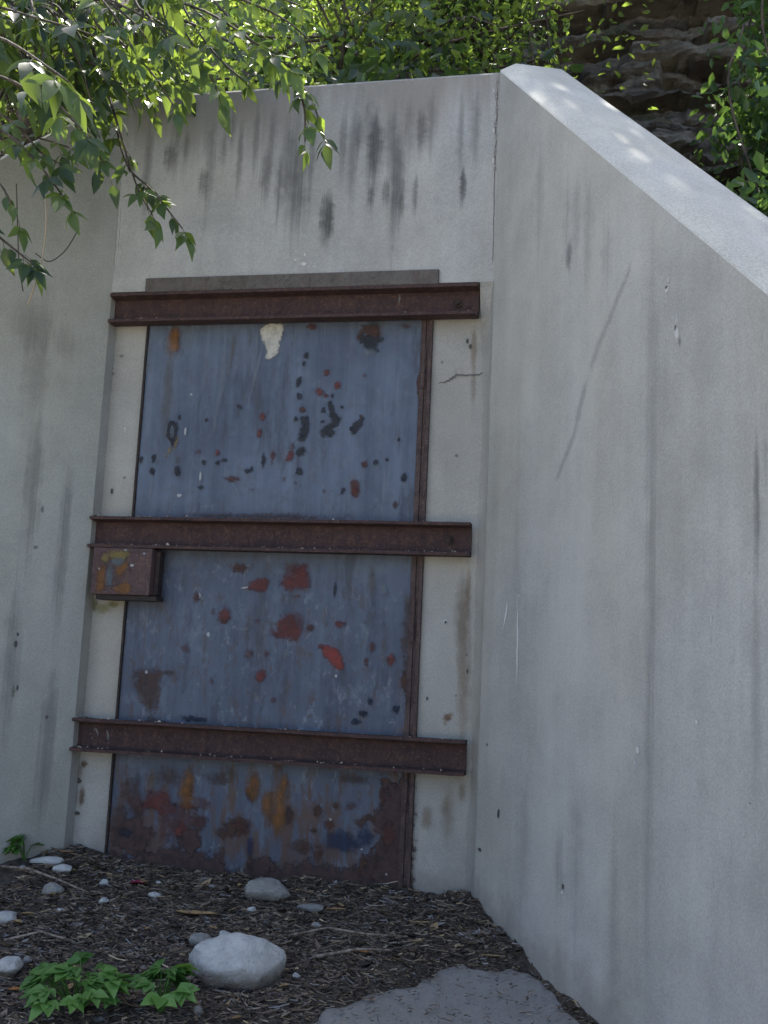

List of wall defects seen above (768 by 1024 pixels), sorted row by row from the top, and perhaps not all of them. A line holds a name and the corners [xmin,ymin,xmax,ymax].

damp [370,122,379,166]
crack [491,88,499,262]
damp [322,201,332,233]
peeling [260,323,284,359]
peeling [357,325,384,353]
crack [438,372,483,384]
peeling [294,352,364,475]
peeling [139,415,186,477]
corrosion [233,564,310,592]
corrosion [108,771,417,888]